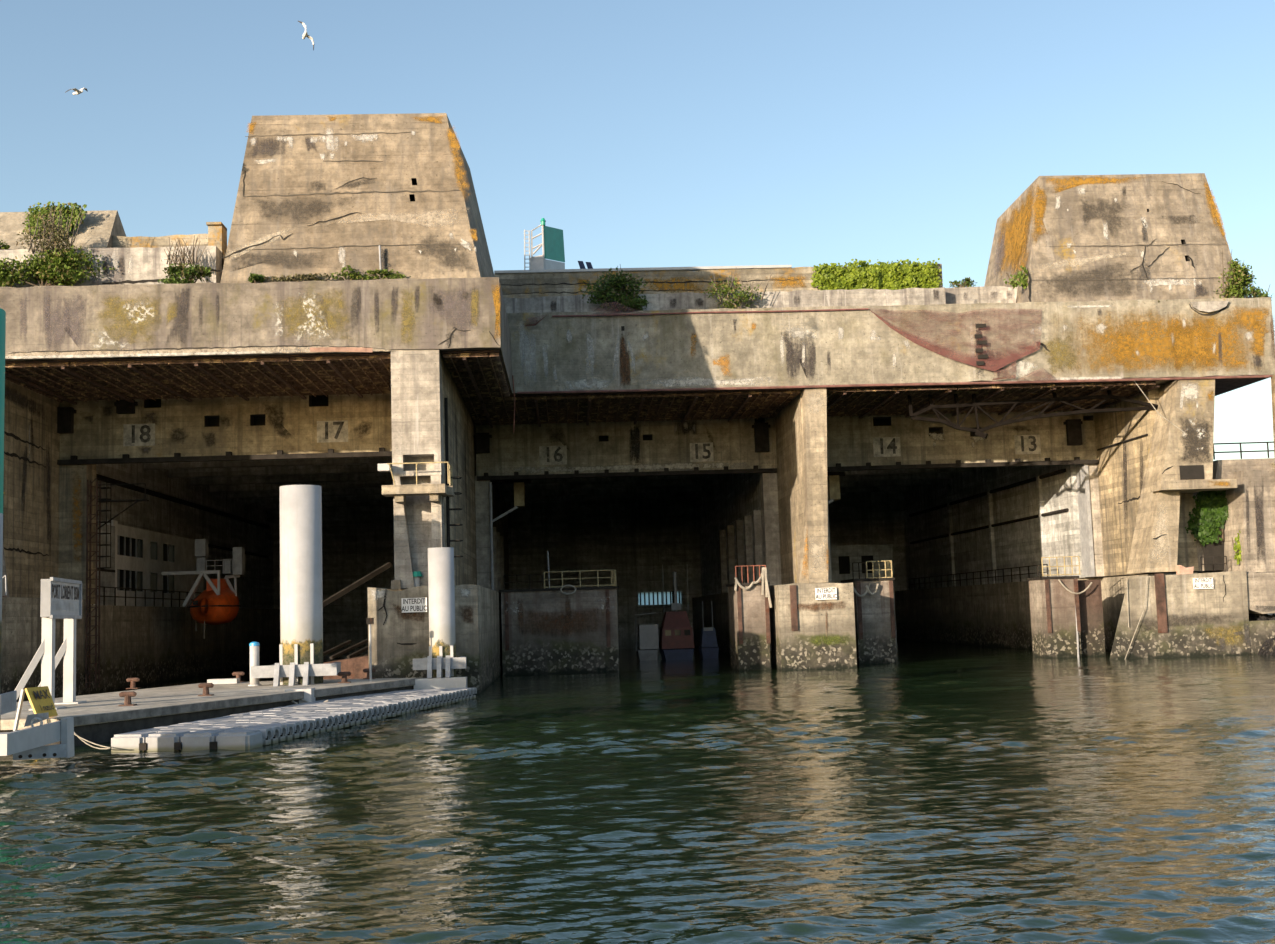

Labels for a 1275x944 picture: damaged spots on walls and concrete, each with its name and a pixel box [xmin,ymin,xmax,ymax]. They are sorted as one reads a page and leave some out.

damp [251,130,377,156]
damp [448,130,468,192]
crack [211,132,466,272]
crack [102,278,160,286]
damp [236,253,312,270]
damp [167,289,219,342]
damp [351,289,398,331]
crack [5,345,388,354]
rust [620,326,631,383]
rust [974,324,988,375]
crack [4,431,46,468]
crack [4,547,49,556]